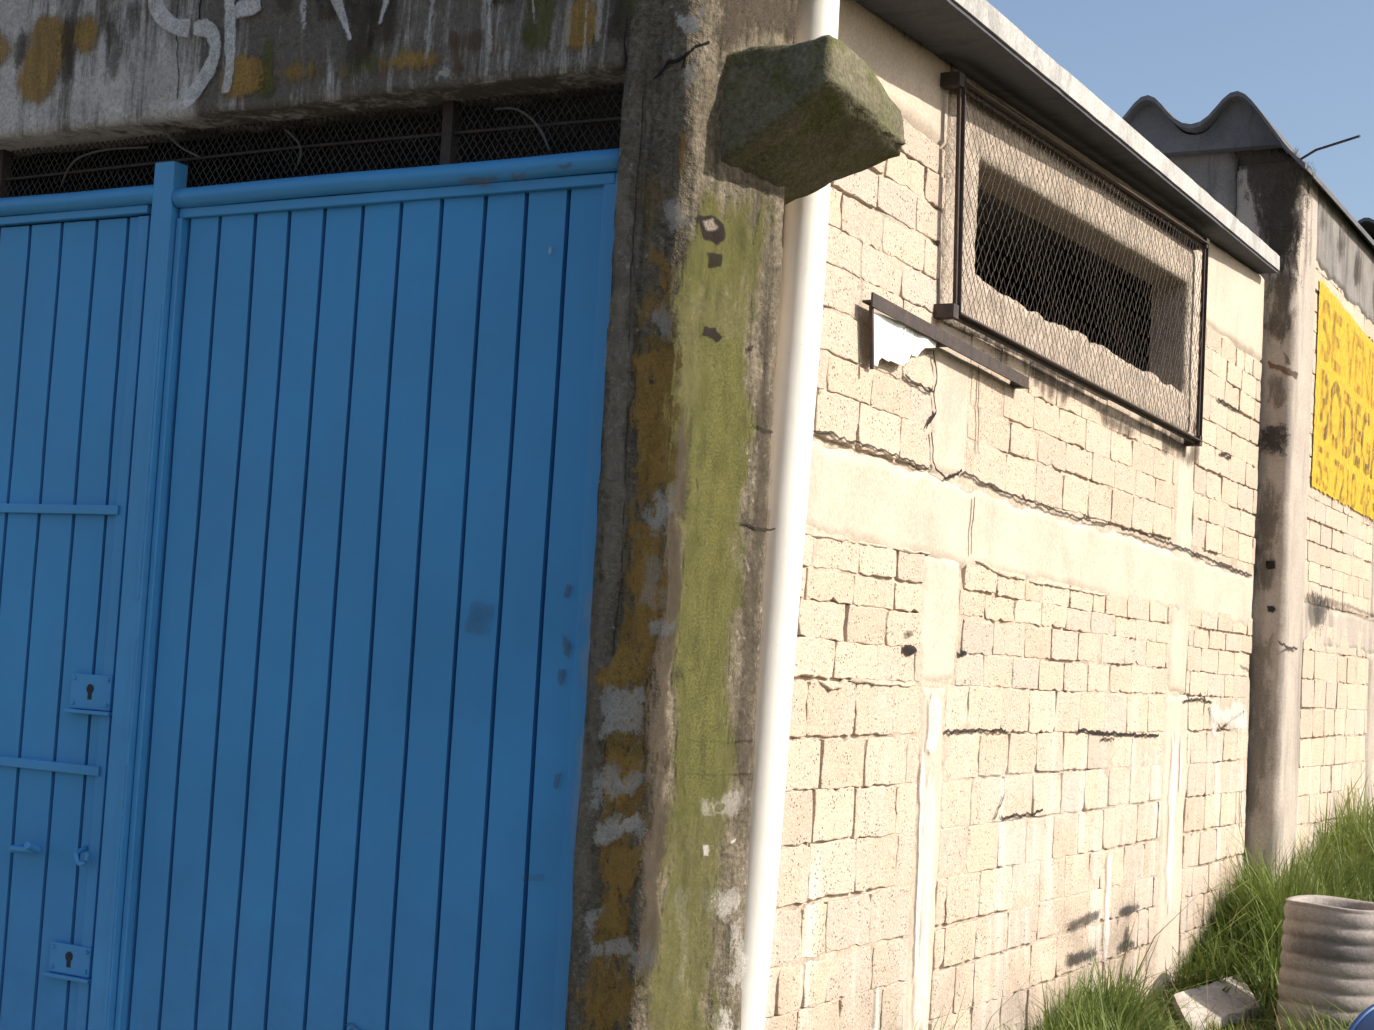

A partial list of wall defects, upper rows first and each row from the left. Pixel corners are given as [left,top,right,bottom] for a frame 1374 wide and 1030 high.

peeling [675,6,705,34]
damp [1232,148,1363,344]
spalling [703,326,722,342]
damp [1258,423,1291,456]
crack [813,350,1252,576]
peeling [569,242,683,1030]
damp [635,327,771,996]
crack [946,727,1006,735]
crack [1078,728,1159,742]
crack [994,796,1043,820]
damp [1066,855,1140,969]
damp [711,1008,731,1030]